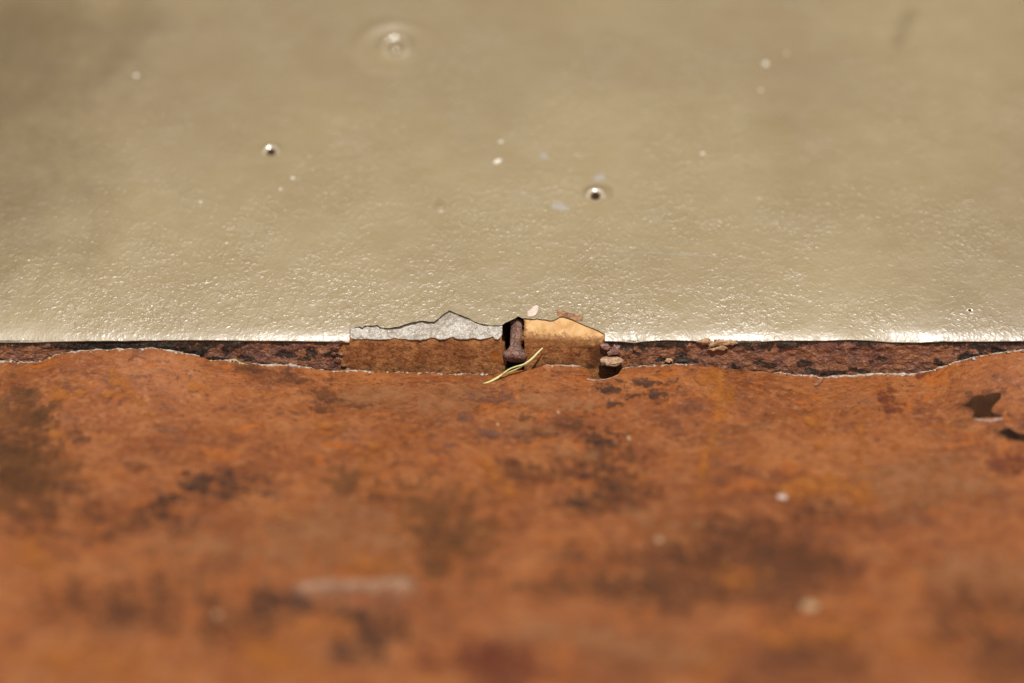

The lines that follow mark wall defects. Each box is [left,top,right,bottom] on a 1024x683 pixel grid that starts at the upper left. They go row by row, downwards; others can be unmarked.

spalling [0,312,502,376]
spalling [520,305,694,379]
rust [0,340,1024,683]